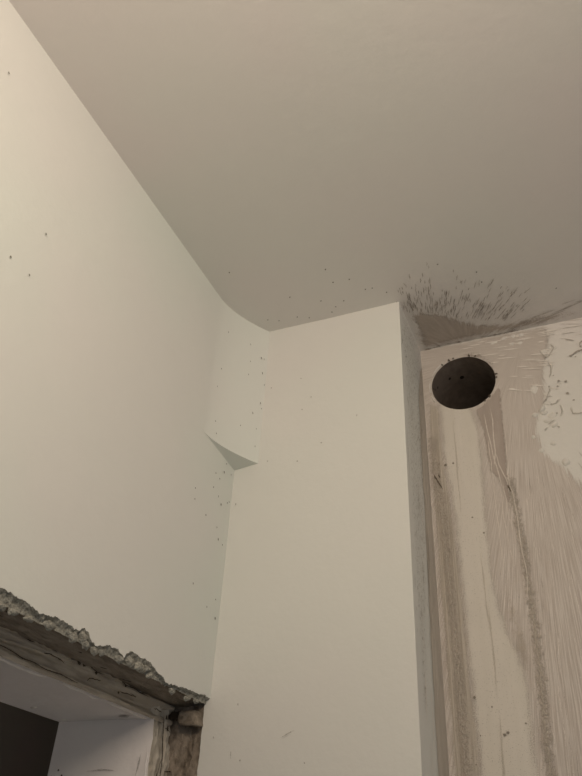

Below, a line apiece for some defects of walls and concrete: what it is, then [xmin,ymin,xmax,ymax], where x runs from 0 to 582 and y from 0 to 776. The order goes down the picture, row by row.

peeling [0,588,210,776]
leakage [396,265,582,776]
flaking render [421,327,582,776]